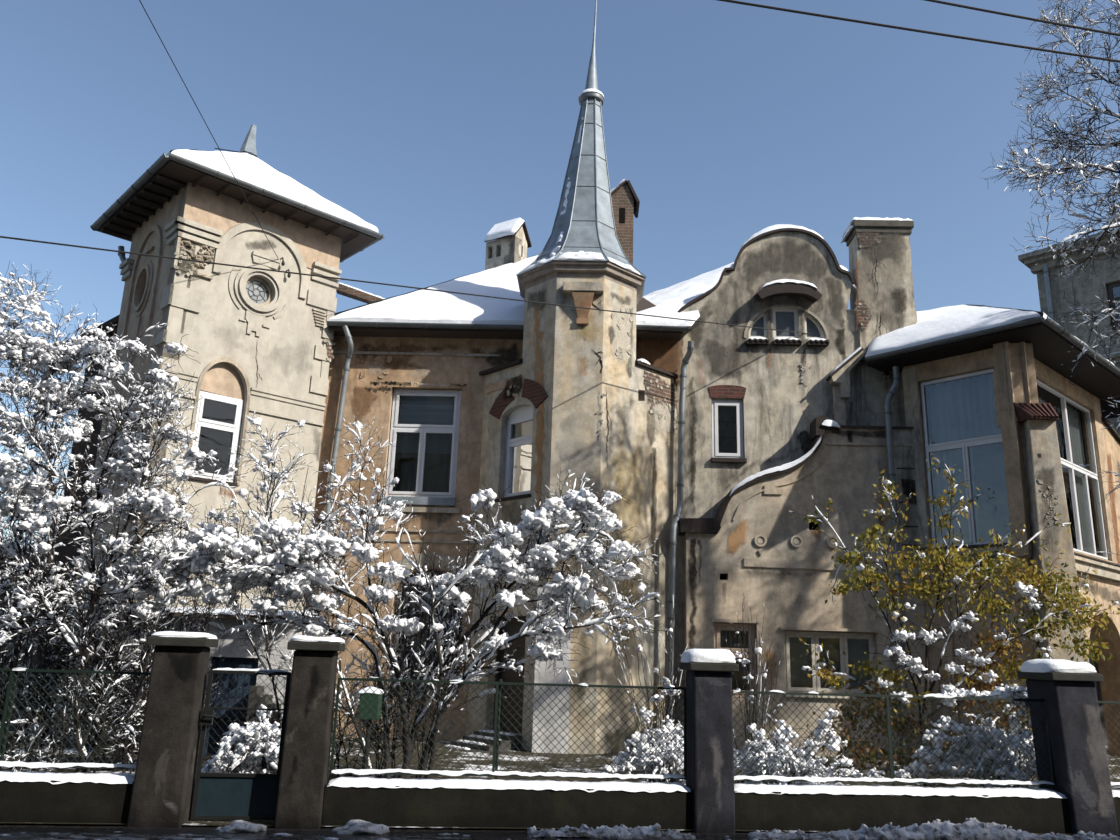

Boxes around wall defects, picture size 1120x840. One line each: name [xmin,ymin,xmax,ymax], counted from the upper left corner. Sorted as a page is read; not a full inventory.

crack [593,350,612,467]
flaking render [609,307,677,436]
flaking render [854,300,872,330]
crack [870,259,887,334]
damp [614,417,657,563]
peeling [728,521,746,553]